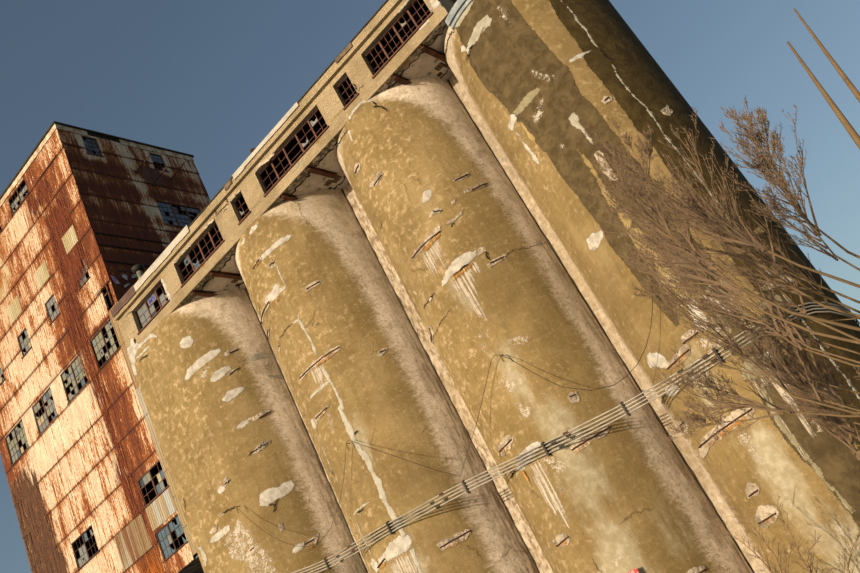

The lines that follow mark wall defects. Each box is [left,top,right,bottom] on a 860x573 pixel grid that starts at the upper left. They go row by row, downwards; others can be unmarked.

damp [422,239,445,274]
spalling [412,199,464,260]
damp [451,0,860,529]
rust [25,174,145,516]
spalling [299,345,342,380]
spalling [664,327,721,370]
spalling [543,426,610,483]
spalling [698,408,770,473]
rust [11,468,69,573]
damp [390,553,419,573]
spalling [435,529,471,551]
spalling [745,482,780,528]